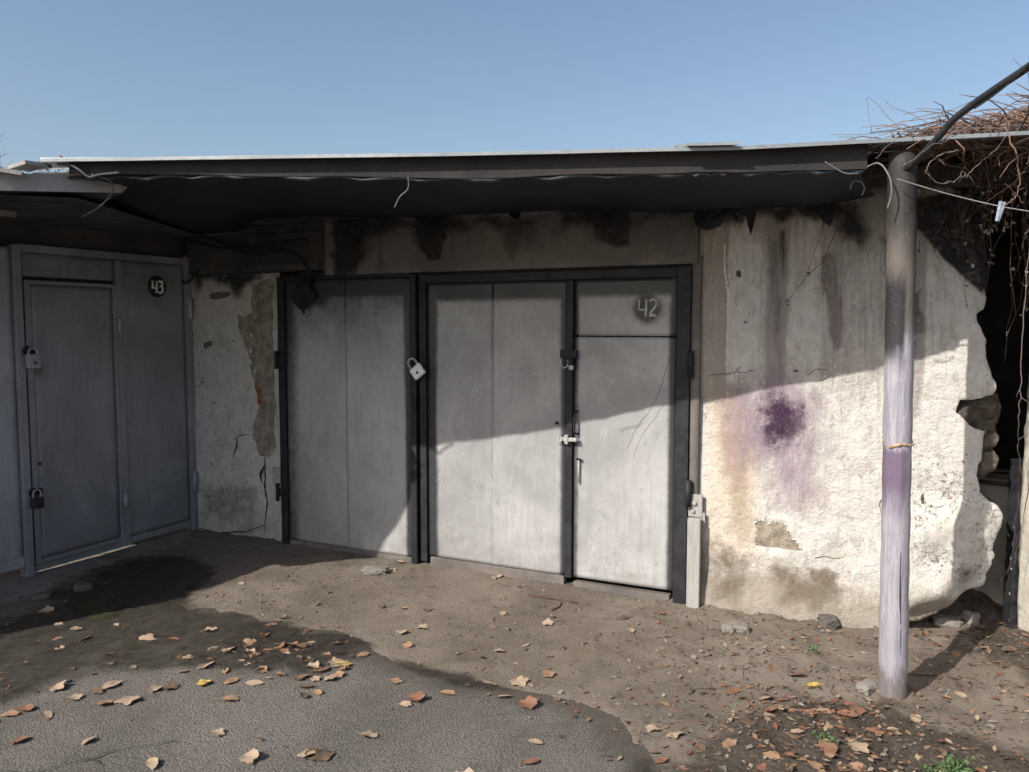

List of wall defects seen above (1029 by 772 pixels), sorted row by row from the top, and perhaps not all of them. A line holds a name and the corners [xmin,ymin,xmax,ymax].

water stain [412,218,446,261]
water stain [821,253,842,349]
flaking render [232,279,276,460]
flaking render [956,392,1001,478]
crack [199,457,268,535]
peeling [754,520,806,551]
water stain [778,569,838,605]